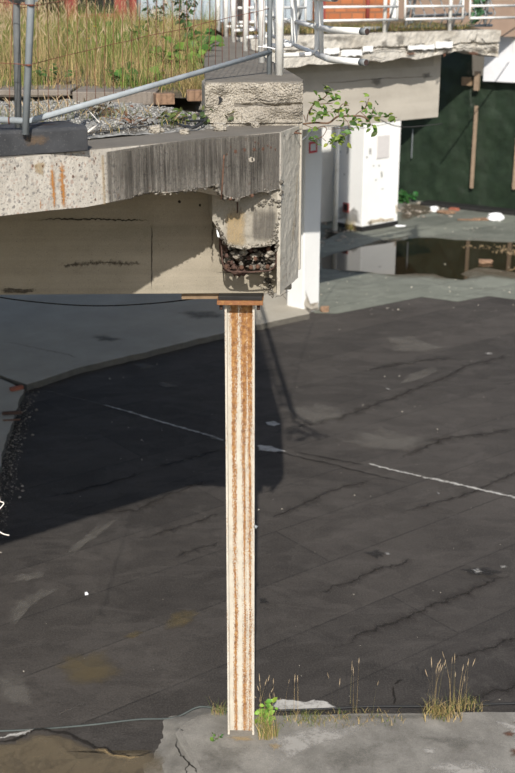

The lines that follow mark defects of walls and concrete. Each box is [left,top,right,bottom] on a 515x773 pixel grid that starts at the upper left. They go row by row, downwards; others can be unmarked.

peeling [324,46,373,57]
peeling [407,41,453,54]
corrosion [32,163,74,206]
crack [45,215,136,223]
spalling [128,155,284,298]